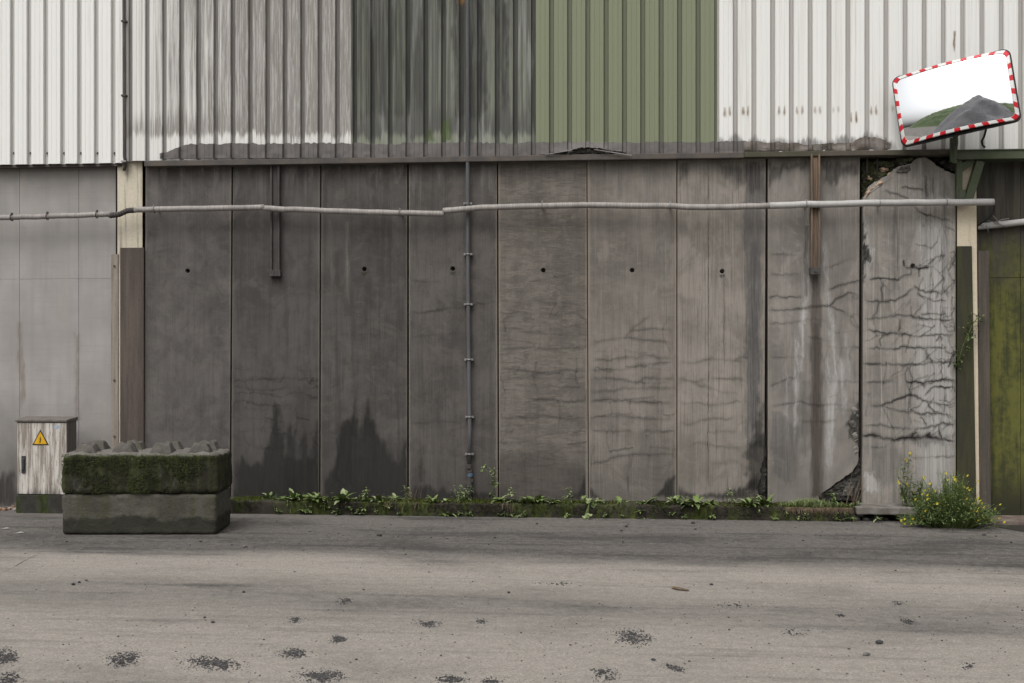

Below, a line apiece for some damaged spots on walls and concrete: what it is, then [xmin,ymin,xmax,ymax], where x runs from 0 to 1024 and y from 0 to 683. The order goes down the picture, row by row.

spalling [861,156,914,199]
leakage [236,407,494,499]
leakage [709,166,765,499]
efflorescence [787,276,806,426]
efflorescence [827,293,847,464]
spalling [819,404,861,502]
crack [772,260,953,441]